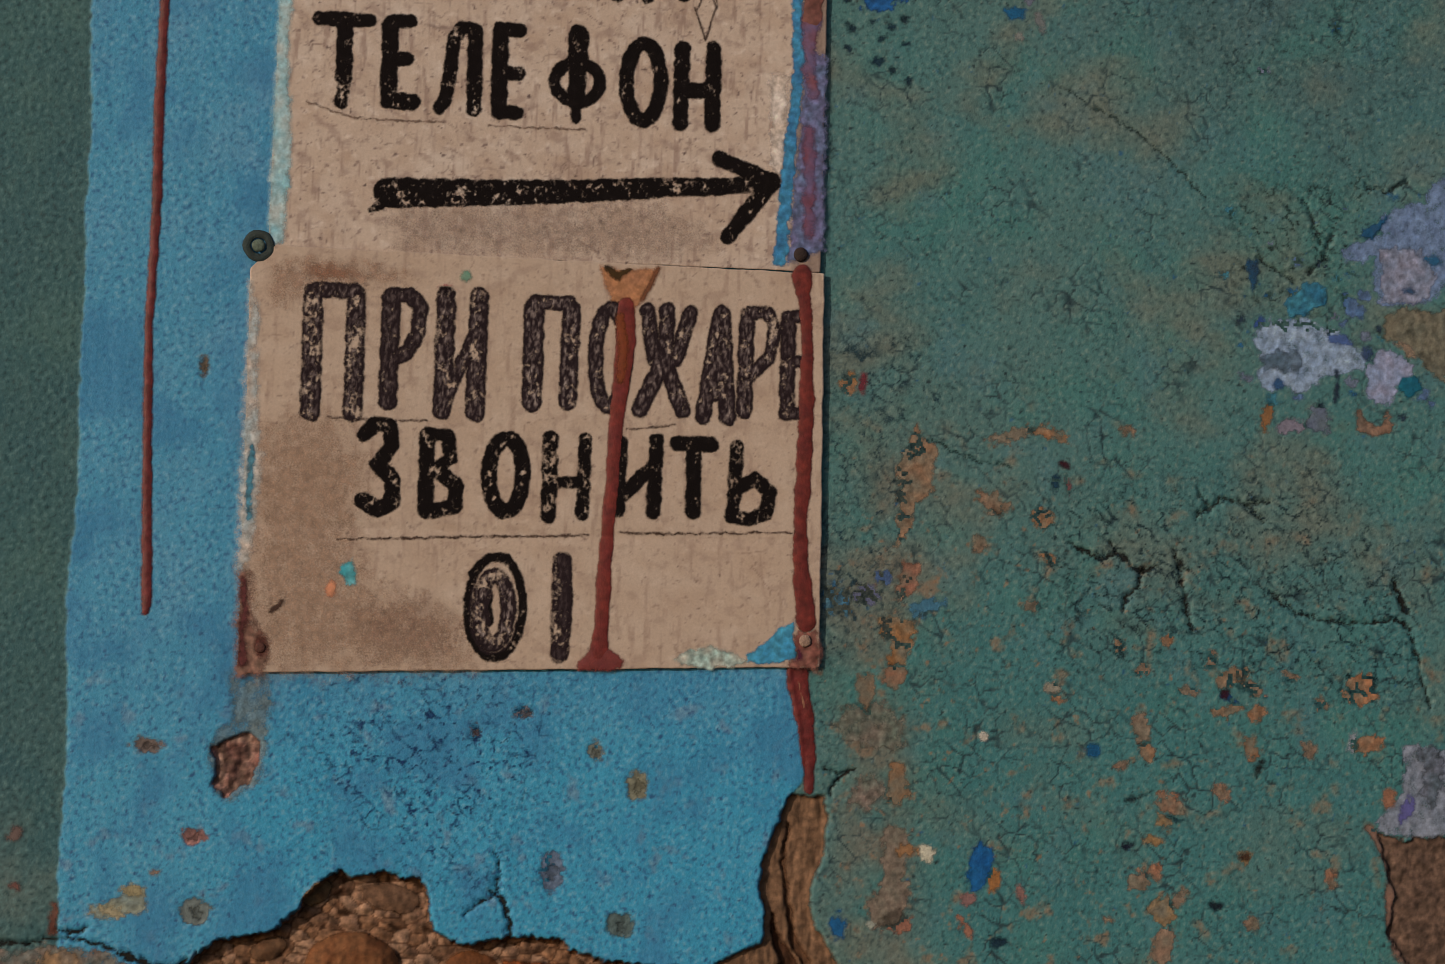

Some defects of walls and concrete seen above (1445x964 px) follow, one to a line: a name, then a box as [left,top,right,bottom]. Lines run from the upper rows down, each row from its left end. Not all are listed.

peeling [1236,178,1445,437]
flaking render [208,675,273,801]
rust [788,628,822,673]
peeling [820,423,947,812]
peeling [1205,650,1268,776]
crack [1047,473,1431,708]
peeling [1315,672,1379,712]
peeling [88,870,159,920]
flaking render [190,870,624,964]
flaking render [718,794,847,964]
peeling [866,825,936,935]
flaking render [1364,743,1445,964]